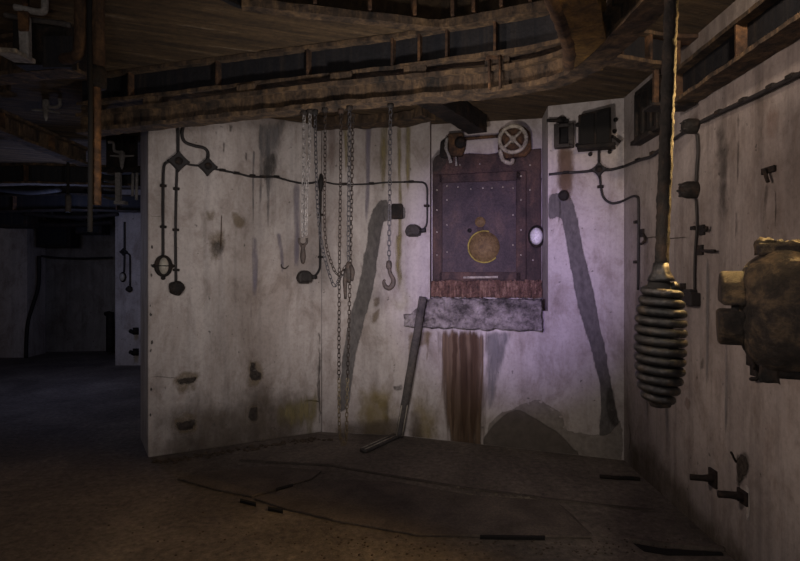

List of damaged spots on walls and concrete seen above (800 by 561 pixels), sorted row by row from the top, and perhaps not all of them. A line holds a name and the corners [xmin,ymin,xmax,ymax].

water stain [246,125,280,209]
peeling [484,193,623,460]
spalling [176,373,197,391]
spalling [250,363,262,384]
rust [442,331,483,444]